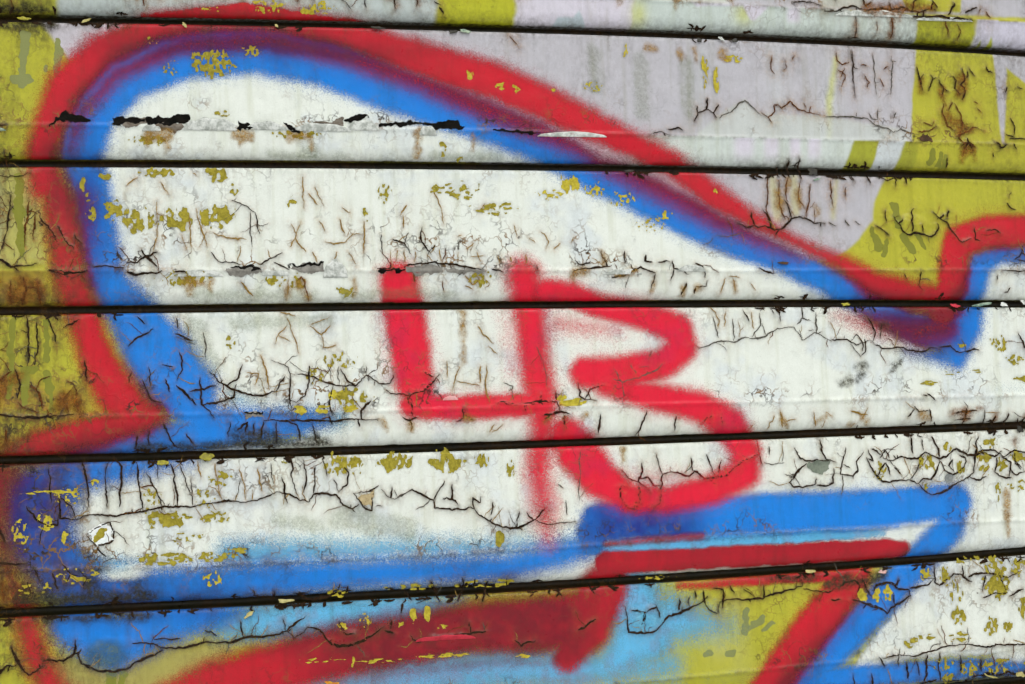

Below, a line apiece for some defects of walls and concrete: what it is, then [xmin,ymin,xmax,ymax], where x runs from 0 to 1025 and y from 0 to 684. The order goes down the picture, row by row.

rust [864,3,933,35]
crack [654,0,1025,167]
peeling [49,110,91,127]
peeling [112,110,464,163]
peeling [79,167,239,234]
peeling [535,175,635,207]
peeling [857,570,893,603]
peeling [920,555,1025,642]
crack [0,577,507,676]
peeling [904,634,936,648]
peeling [934,657,1025,684]